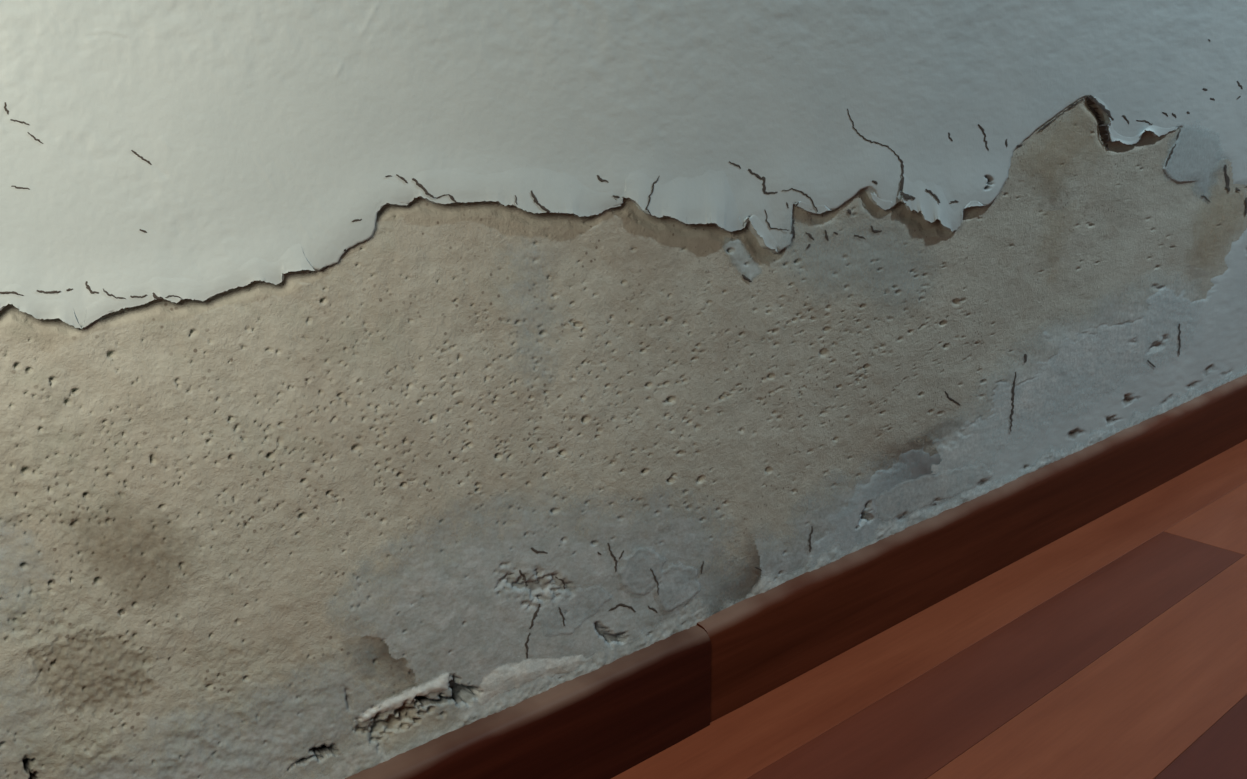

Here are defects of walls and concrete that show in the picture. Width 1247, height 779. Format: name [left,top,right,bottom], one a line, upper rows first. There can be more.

peeling [375,167,621,217]
peeling [621,169,744,232]
crack [847,109,958,203]
peeling [901,174,963,232]
peeling [0,284,82,329]
peeling [81,243,315,328]
efflorescence [931,285,1194,485]
water stain [756,465,918,588]
efflorescence [349,497,728,713]
flaking render [354,673,450,722]
flaking render [467,595,703,715]
spalling [332,747,391,779]